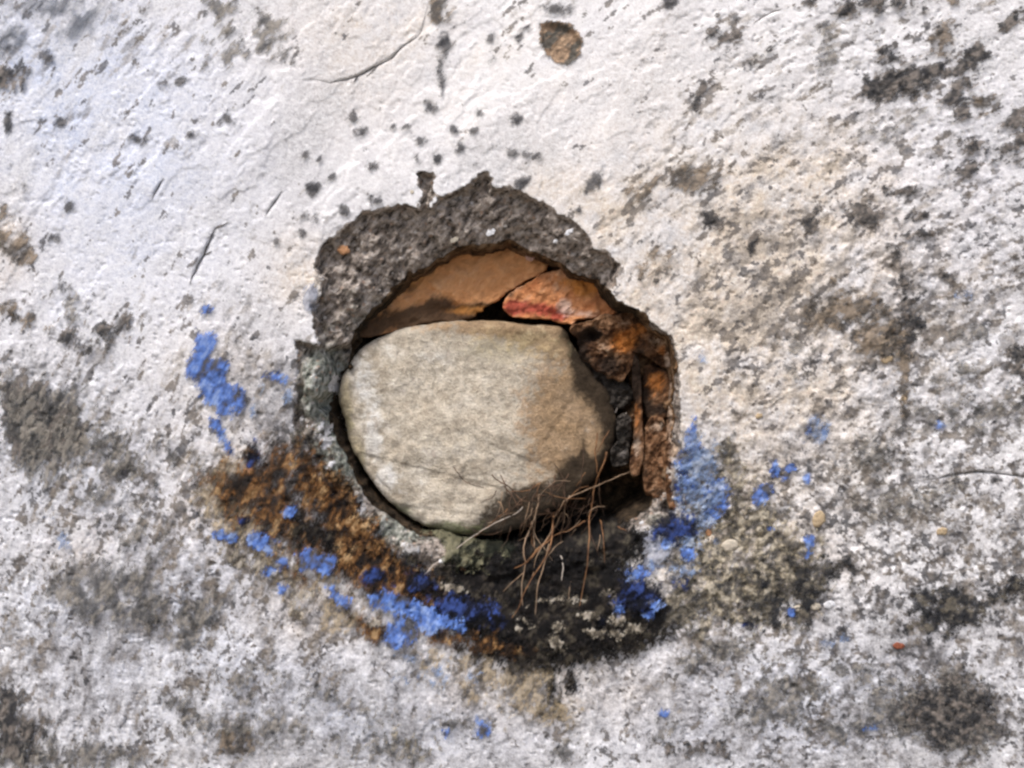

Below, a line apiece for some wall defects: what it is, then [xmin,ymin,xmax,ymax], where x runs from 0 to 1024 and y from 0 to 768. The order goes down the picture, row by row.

crack [309,4,428,83]
spalling [185,171,734,662]
corrosion [189,436,444,646]
corrosion [417,628,537,657]
water stain [145,423,1024,768]
peeling [798,534,814,559]